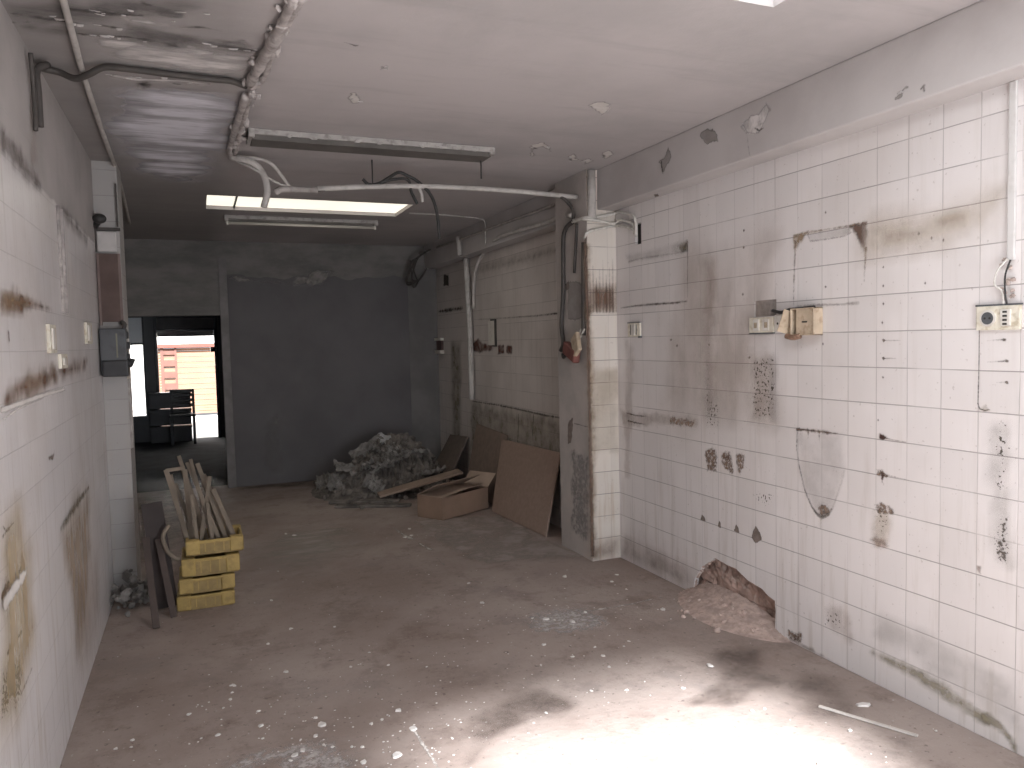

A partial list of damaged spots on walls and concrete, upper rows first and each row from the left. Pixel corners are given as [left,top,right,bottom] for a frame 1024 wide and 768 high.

peeling [700,119,717,144]
rust [2,296,43,312]
rust [6,360,85,404]
rust [584,238,614,557]
mould [753,359,774,416]
water stain [810,503,829,518]
water stain [63,487,89,628]
mould [996,518,1008,561]
flaking render [698,560,776,618]
water stain [2,535,33,718]